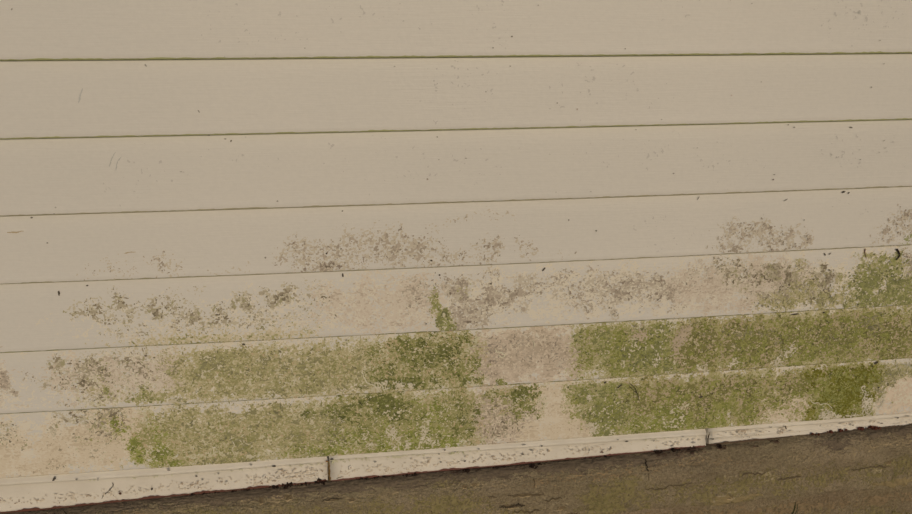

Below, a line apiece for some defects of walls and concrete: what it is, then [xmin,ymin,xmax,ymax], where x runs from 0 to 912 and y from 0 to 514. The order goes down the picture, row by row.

leakage [21,206,838,470]
leakage [870,204,912,287]